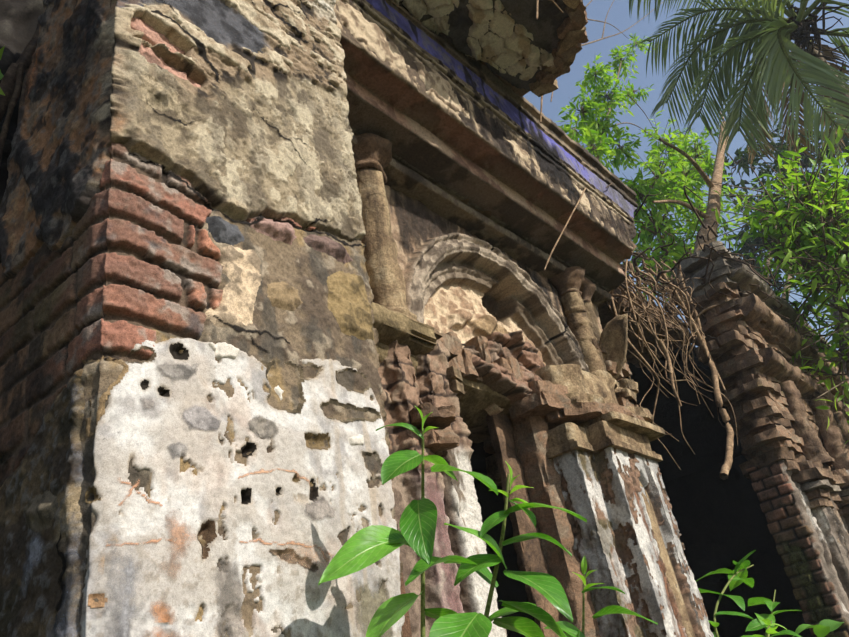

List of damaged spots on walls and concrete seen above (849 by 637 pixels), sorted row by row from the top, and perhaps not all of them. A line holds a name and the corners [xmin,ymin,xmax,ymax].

flaking render [122,0,470,119]
flaking render [393,0,554,81]
crack [129,152,366,247]
crack [208,315,290,353]
flaking render [0,142,401,637]
flaking render [589,449,711,637]
flaking render [391,615,405,637]